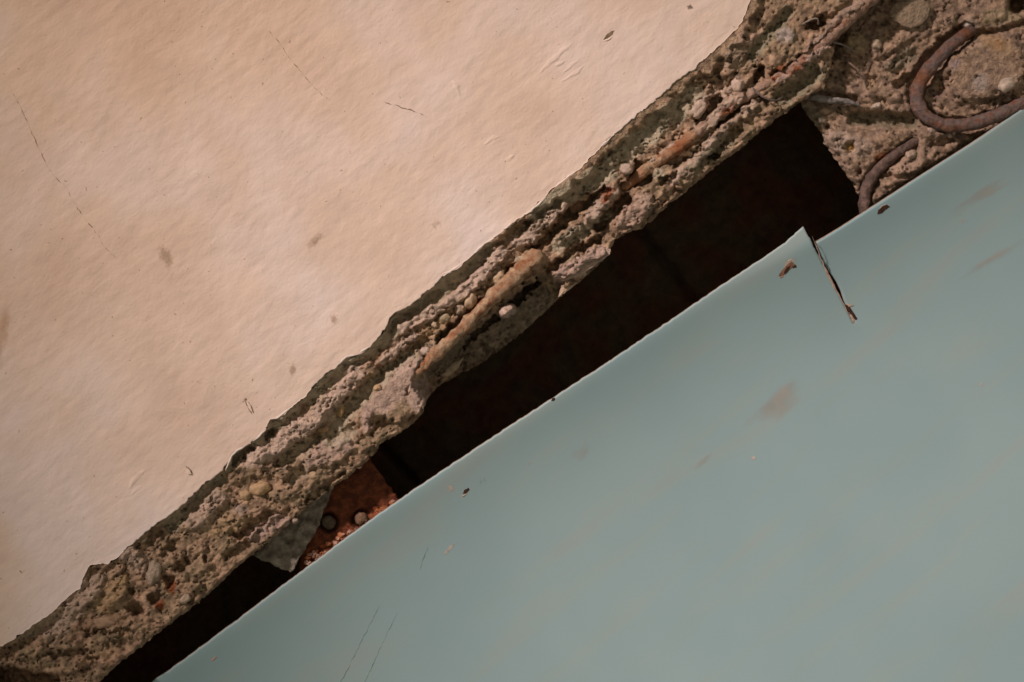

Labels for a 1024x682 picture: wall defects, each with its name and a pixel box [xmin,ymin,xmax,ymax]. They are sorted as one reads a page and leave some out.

spalling [783,0,879,74]
spalling [690,99,707,119]
spalling [731,78,744,92]
spalling [736,79,775,109]
spalling [800,0,1024,214]
spalling [619,119,709,191]
spalling [567,248,611,280]
peeling [779,258,796,278]
spalling [413,236,552,382]
spalling [249,480,271,496]
spalling [145,560,162,586]
spalling [91,615,116,629]